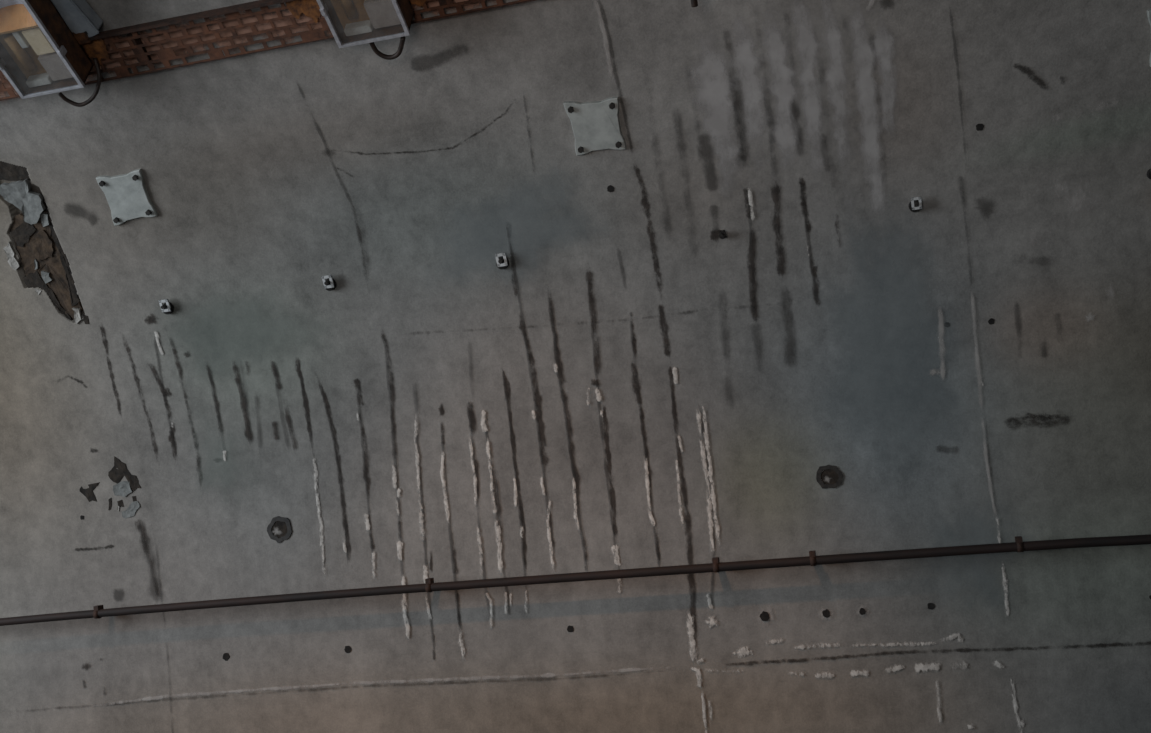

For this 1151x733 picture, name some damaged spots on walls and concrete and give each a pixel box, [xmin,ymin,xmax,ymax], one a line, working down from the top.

rust [86,10,332,82]
spalling [0,161,89,324]
damp [744,189,757,320]
spalling [80,456,141,518]
damp [321,388,351,554]
damp [467,403,503,572]
damp [503,372,527,565]
damp [519,321,554,567]
damp [548,298,587,567]
damp [586,272,622,593]
damp [631,313,660,561]
damp [659,305,753,733]